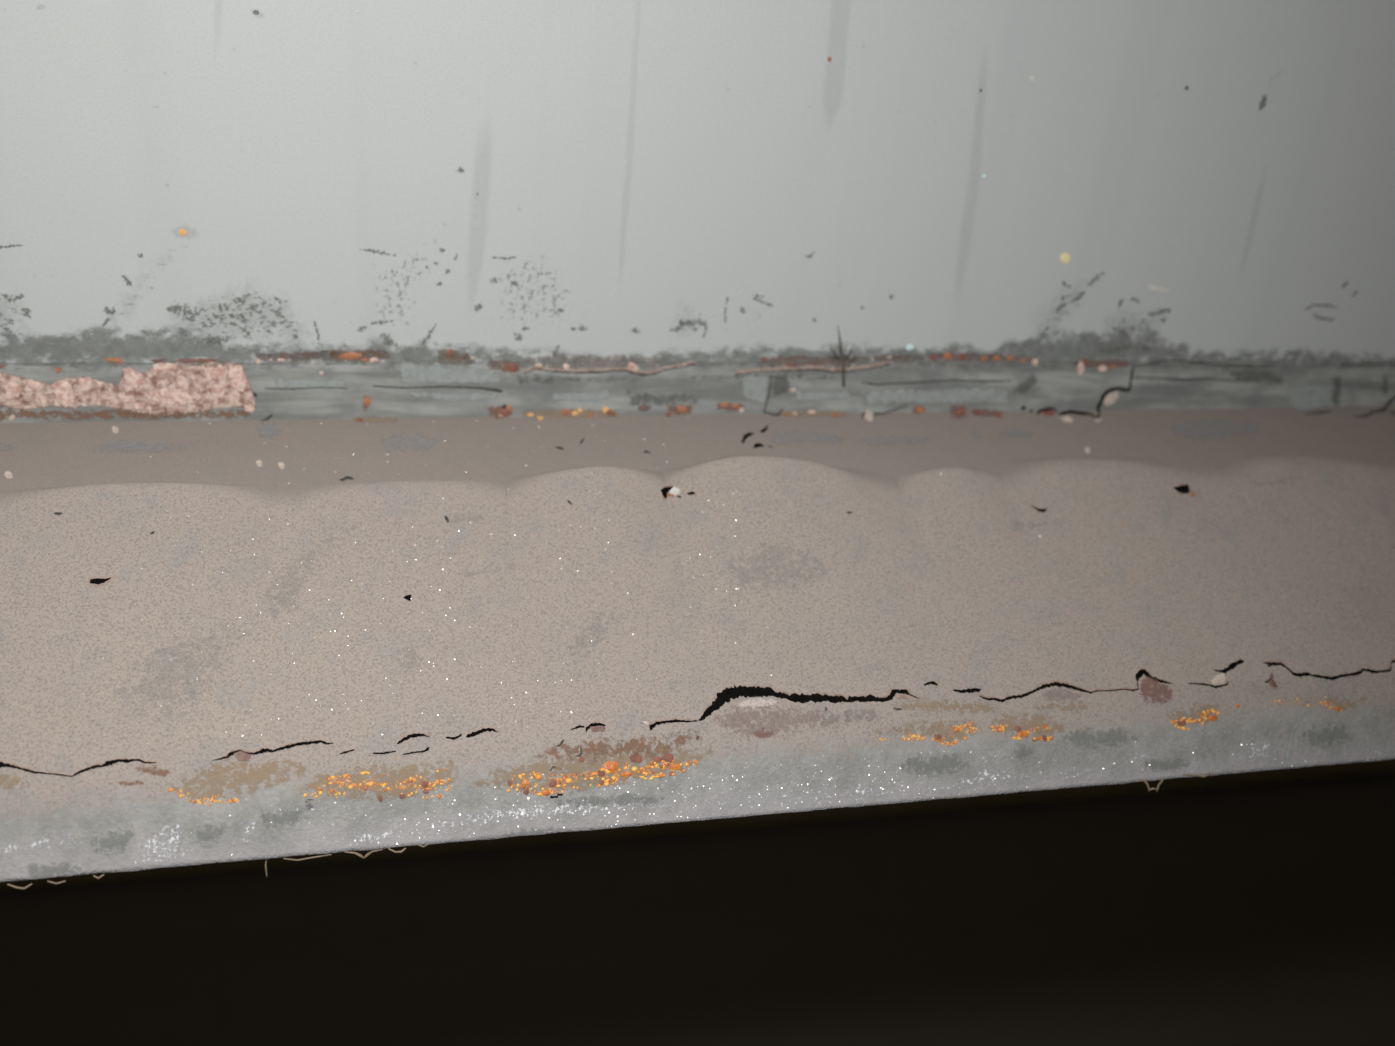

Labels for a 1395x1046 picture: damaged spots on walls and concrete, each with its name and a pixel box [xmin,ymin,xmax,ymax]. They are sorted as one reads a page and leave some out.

water stain [0,294,31,340]
water stain [166,292,298,344]
peeling [0,357,255,421]
corrosion [488,404,617,420]
crack [641,657,1395,740]
crack [0,757,157,777]
corrosion [119,761,454,809]
crack [211,726,499,761]
crack [550,720,606,771]
corrosion [477,732,703,796]
corrosion [879,700,1088,746]
water stain [418,801,680,833]